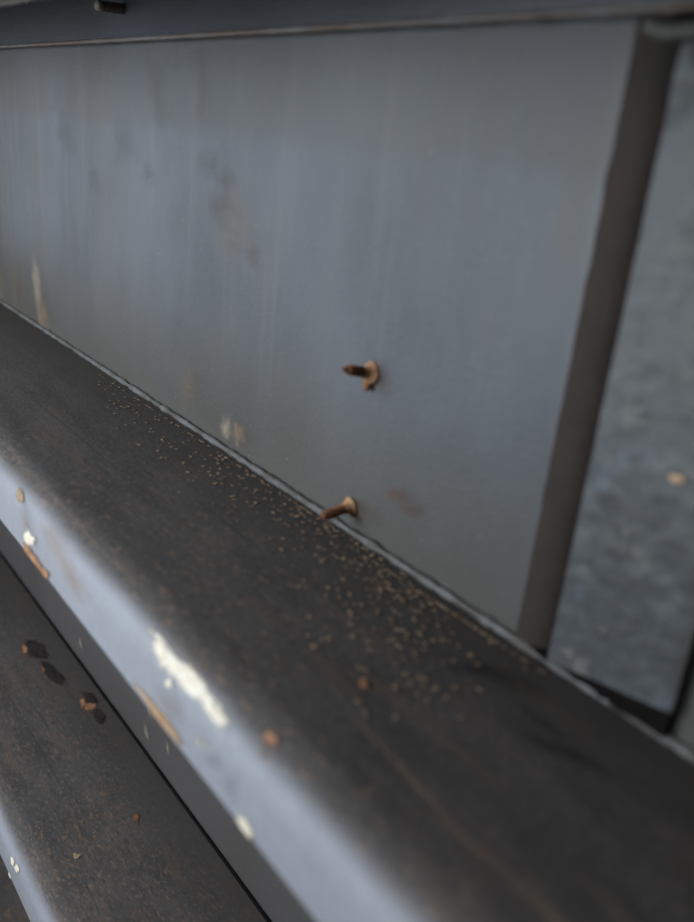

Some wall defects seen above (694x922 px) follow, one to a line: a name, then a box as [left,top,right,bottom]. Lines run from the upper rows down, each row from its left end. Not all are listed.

corrosion [98,374,546,708]
peeling [133,682,181,745]
peeling [149,629,229,732]